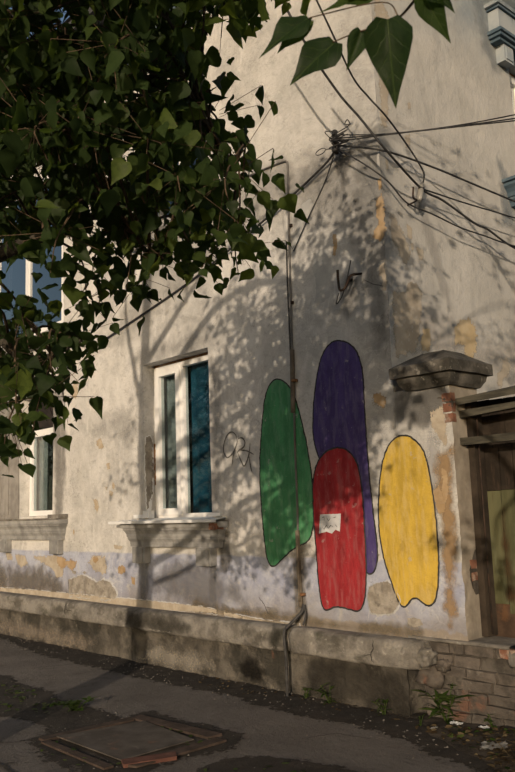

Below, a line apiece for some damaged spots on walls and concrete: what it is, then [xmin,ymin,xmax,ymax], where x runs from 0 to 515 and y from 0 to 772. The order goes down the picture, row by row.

peeling [374,0,390,19]
peeling [378,75,389,127]
peeling [372,178,424,264]
peeling [379,263,431,358]
peeling [454,317,478,358]
flaking render [144,435,154,511]
peeling [0,552,301,626]
flaking render [367,579,401,617]